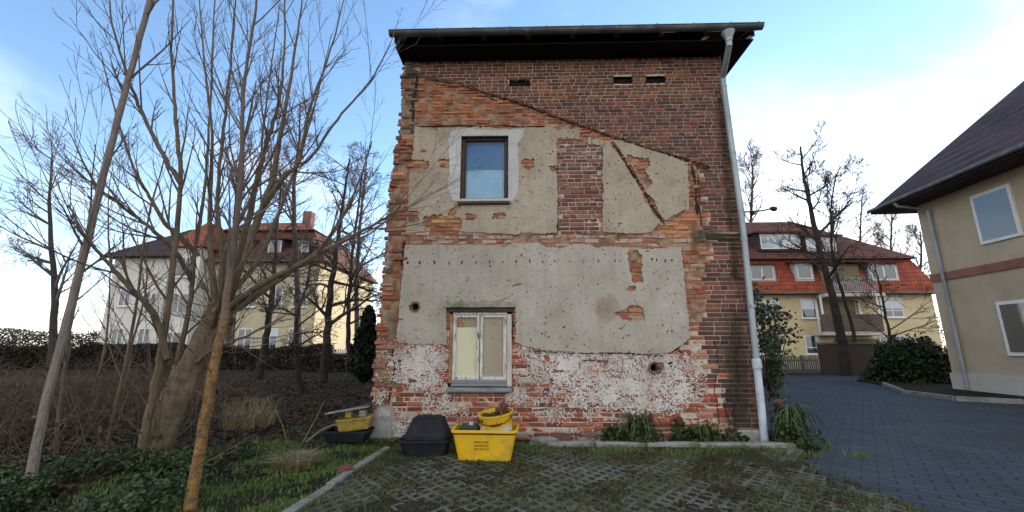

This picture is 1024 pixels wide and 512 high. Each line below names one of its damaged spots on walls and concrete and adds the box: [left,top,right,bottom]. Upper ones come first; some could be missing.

crack [602,144,665,225]
peeling [402,200,718,438]